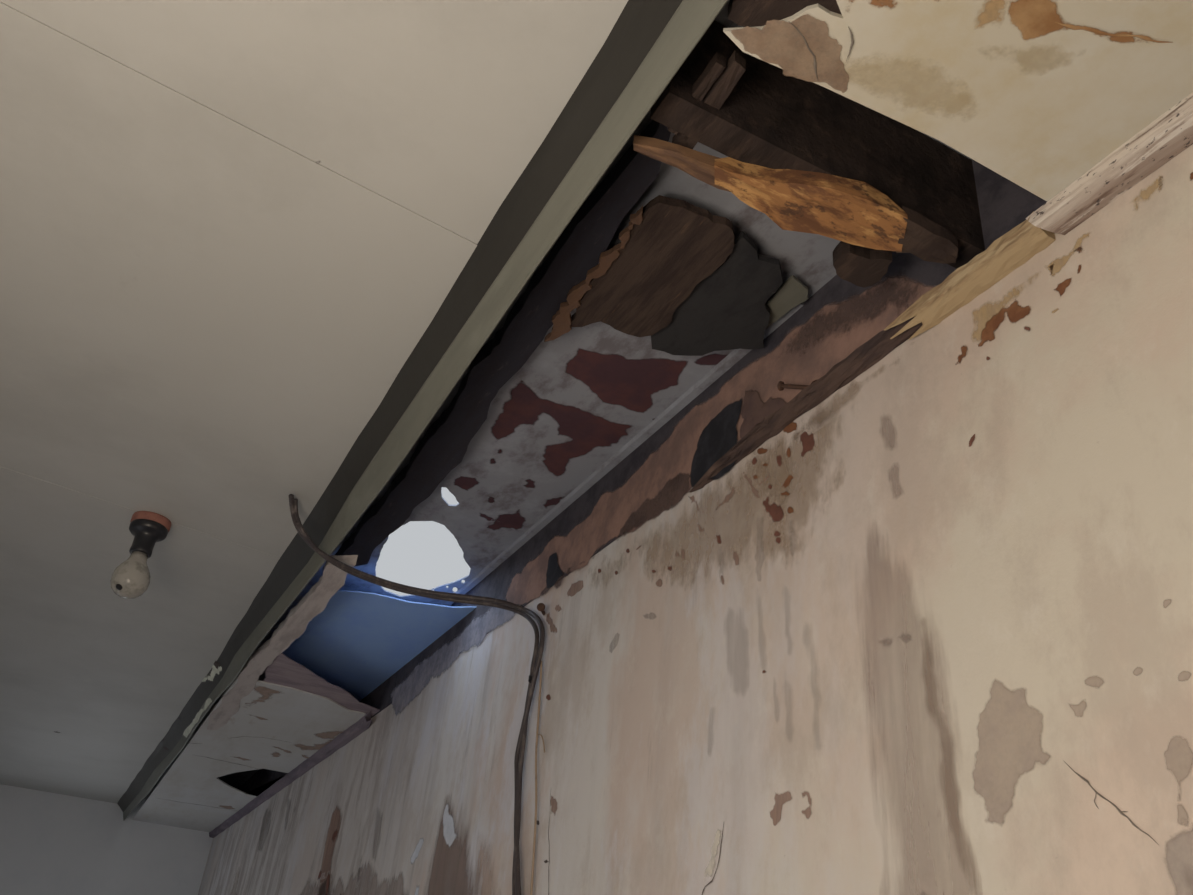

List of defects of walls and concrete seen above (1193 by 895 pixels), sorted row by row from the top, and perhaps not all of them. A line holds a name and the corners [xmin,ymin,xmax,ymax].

damp [978,0,1173,43]
flaking render [971,159,1047,250]
flaking render [360,251,956,718]
damp [546,581,583,632]
damp [924,648,935,713]
flaking render [237,769,288,793]
damp [428,808,491,895]
damp [944,746,975,883]
peeling [973,680,1050,824]
peeling [1164,736,1193,895]